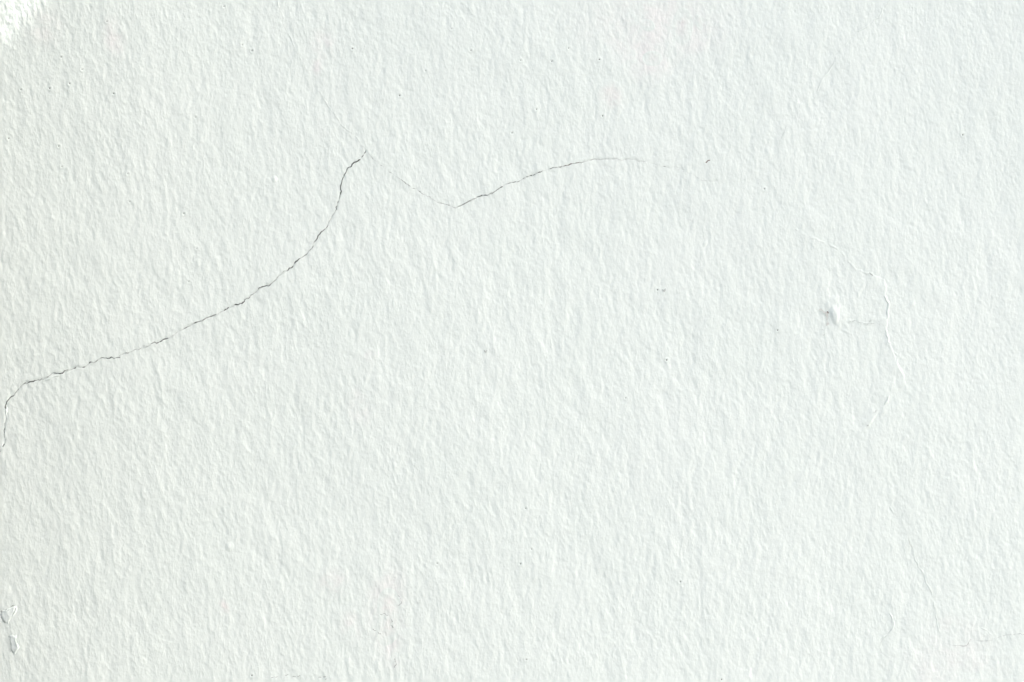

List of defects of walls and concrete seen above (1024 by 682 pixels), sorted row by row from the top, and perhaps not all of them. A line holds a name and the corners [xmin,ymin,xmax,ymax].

crack [0,0,666,451]